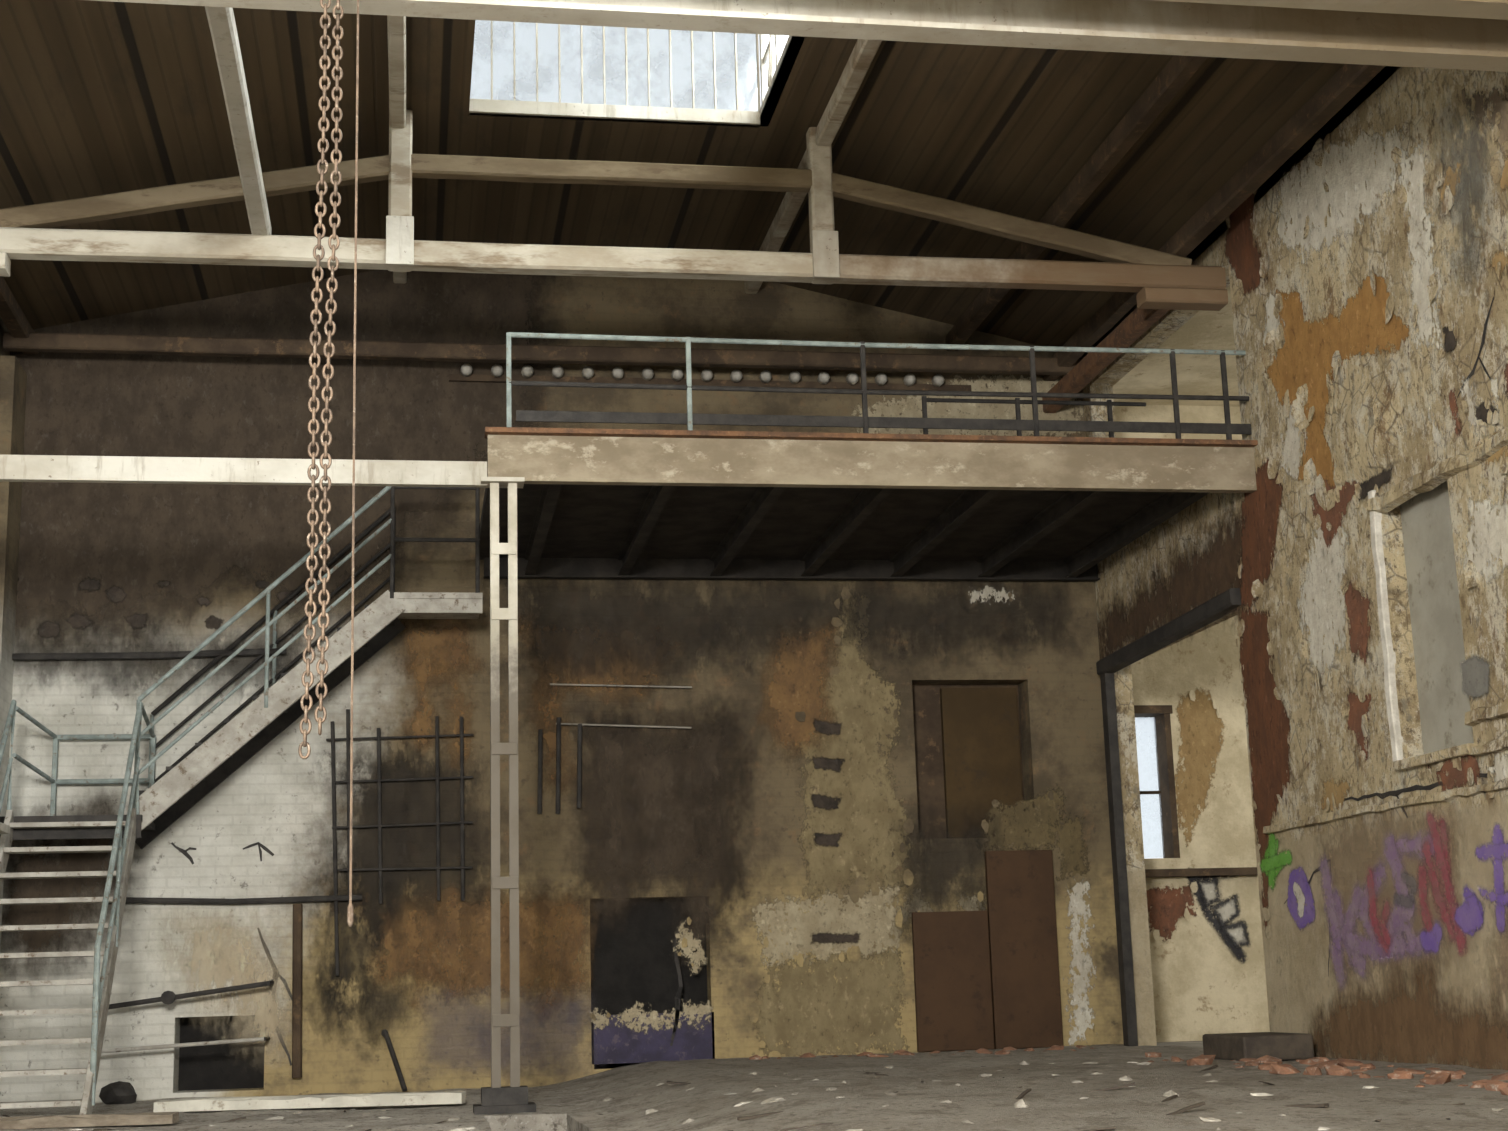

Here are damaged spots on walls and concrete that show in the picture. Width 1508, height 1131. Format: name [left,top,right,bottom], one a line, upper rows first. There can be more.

flaking render [1458,86,1508,194]
flaking render [1427,363,1508,473]
peeling [1224,190,1459,939]
water stain [681,727,730,952]
spalling [795,712,842,735]
spalling [811,794,841,810]
spalling [814,833,842,847]
spalling [812,757,845,773]
peeling [1175,687,1225,847]
water stain [320,893,354,1027]
spalling [796,933,859,967]
peeling [1146,881,1198,942]